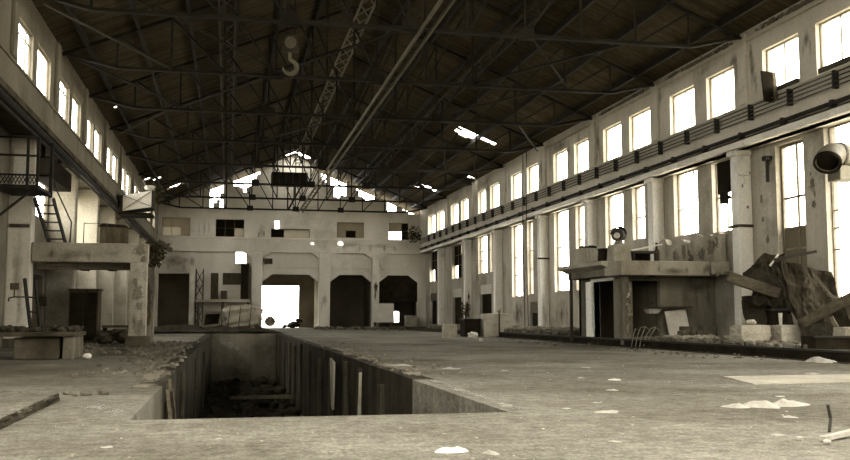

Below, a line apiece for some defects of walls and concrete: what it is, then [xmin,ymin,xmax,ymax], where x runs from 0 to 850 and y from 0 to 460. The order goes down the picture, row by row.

flaking render [673,237,718,261]